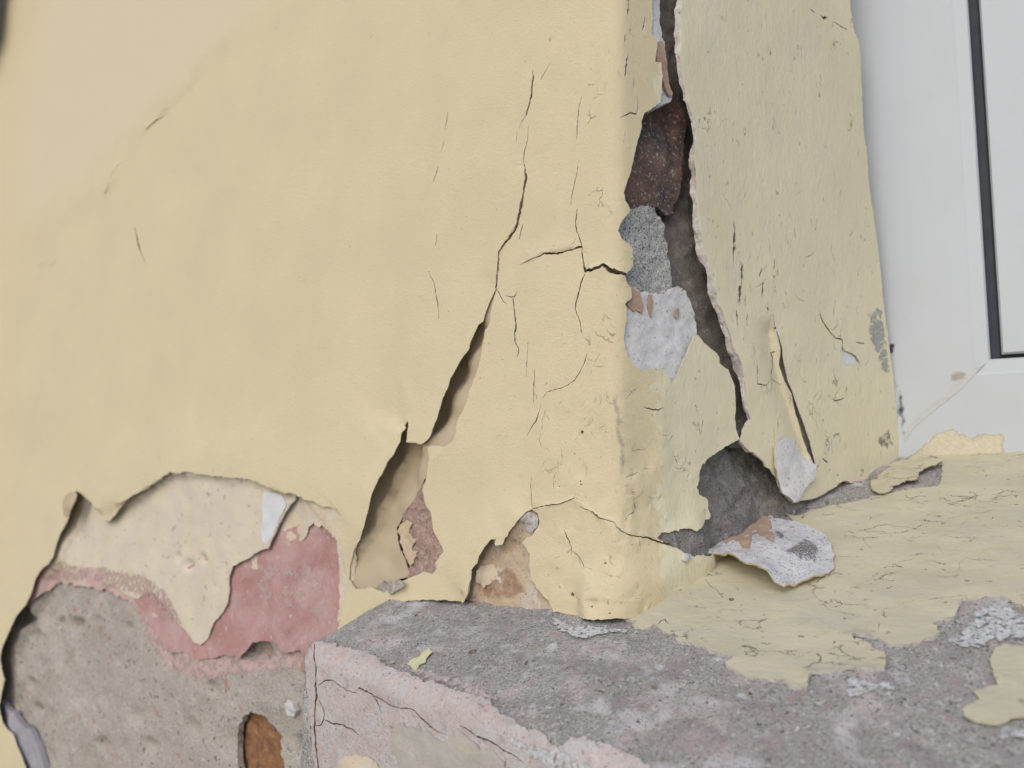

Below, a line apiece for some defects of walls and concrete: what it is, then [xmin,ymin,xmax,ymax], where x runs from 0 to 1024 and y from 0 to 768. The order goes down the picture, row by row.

crack [495,0,844,451]
spalling [654,330,818,562]
spalling [0,289,650,768]
crack [530,449,670,600]
crack [313,644,524,768]
peeling [846,677,902,697]
peeling [948,604,1024,739]